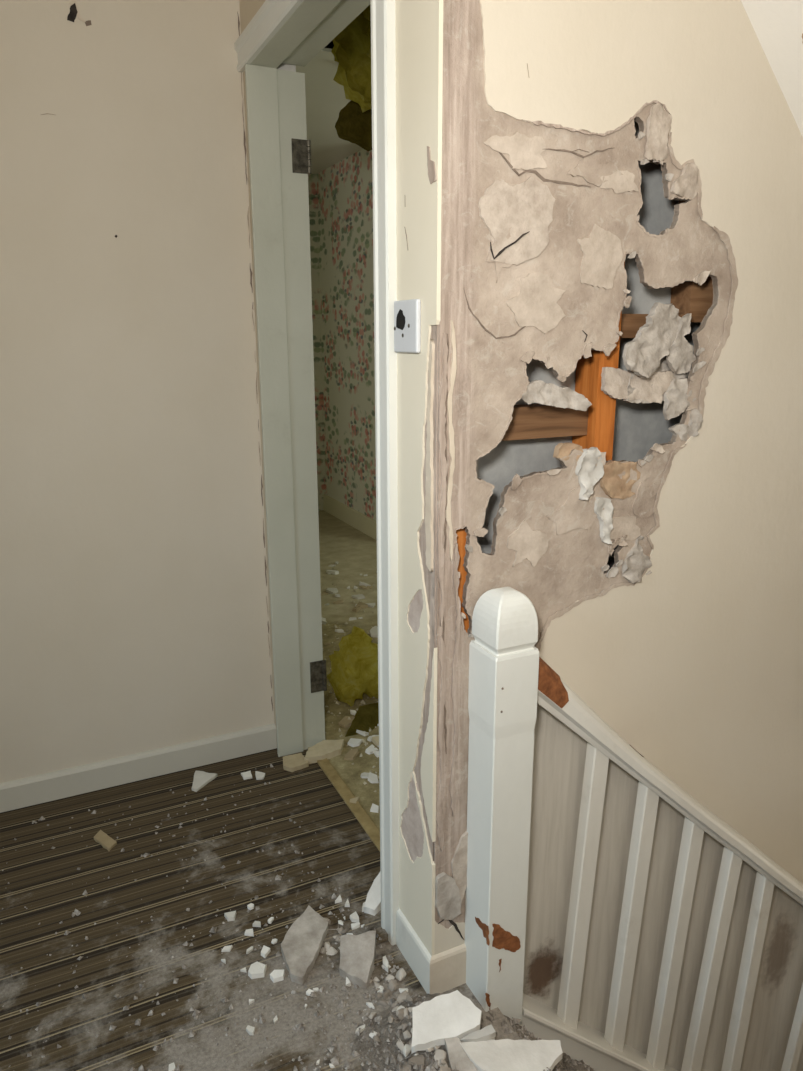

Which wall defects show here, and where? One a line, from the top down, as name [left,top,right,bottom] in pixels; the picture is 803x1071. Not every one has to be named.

flaking render [401,0,738,972]